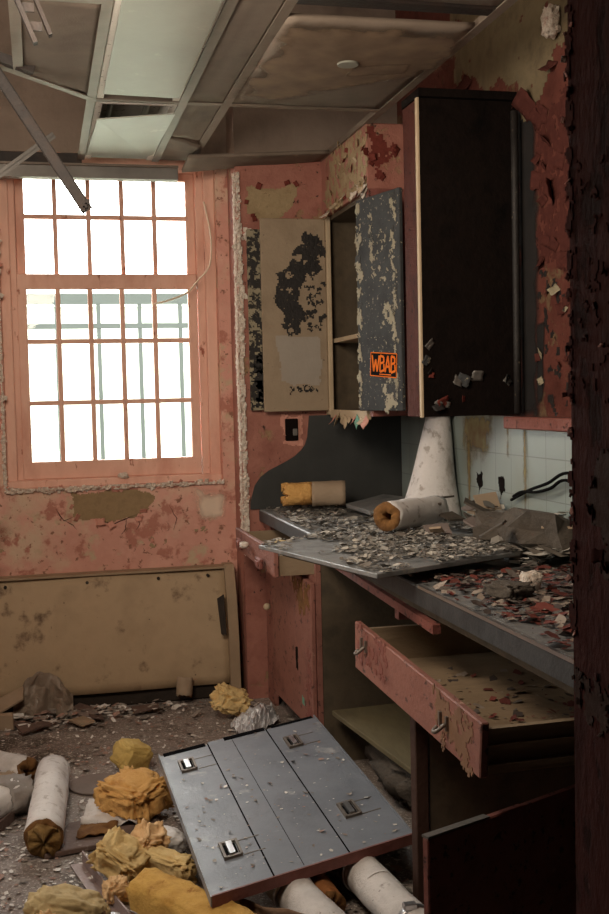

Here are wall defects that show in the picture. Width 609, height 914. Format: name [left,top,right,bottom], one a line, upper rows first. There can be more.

leakage [240,26,460,100]
peeling [319,126,400,220]
peeling [450,0,575,416]
peeling [0,293,224,532]
spalling [231,171,299,531]
peeling [280,414,303,446]